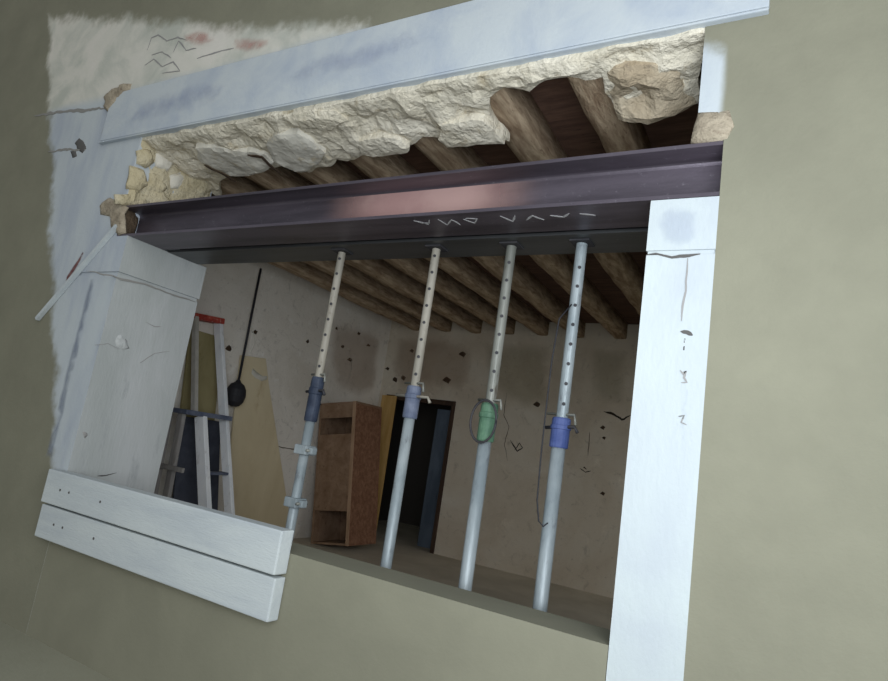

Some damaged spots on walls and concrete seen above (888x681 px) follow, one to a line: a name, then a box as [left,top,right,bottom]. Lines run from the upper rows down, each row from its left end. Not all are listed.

spalling [142,28,734,196]
crack [647,253,700,321]